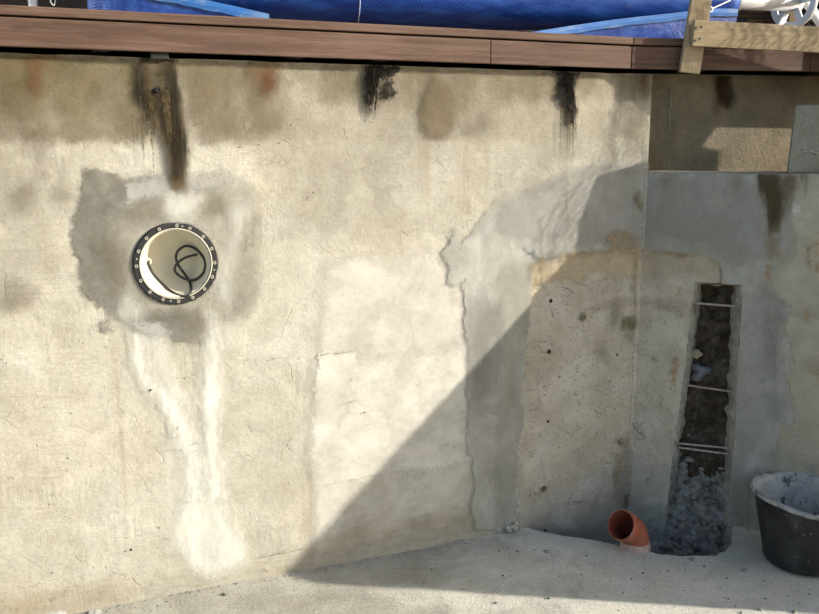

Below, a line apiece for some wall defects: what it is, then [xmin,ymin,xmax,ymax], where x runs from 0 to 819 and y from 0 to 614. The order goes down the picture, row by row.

leakage [0,54,102,128]
leakage [114,57,282,191]
leakage [348,65,401,120]
leakage [551,71,581,156]
leakage [758,174,792,233]
leakage [70,168,245,570]
spalling [511,249,742,544]